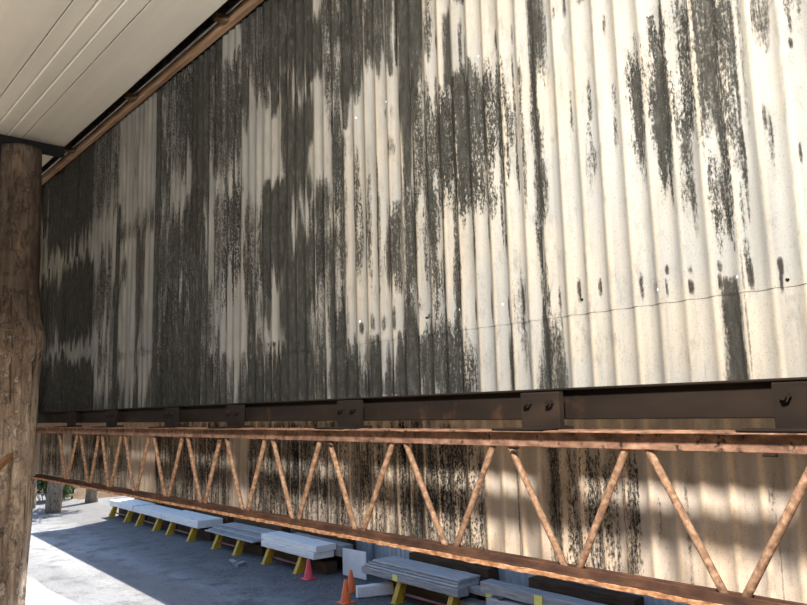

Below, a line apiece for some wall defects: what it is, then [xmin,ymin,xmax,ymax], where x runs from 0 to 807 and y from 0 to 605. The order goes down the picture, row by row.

leakage [750,0,769,52]
leakage [38,0,568,412]
leakage [625,0,754,380]
leakage [154,437,231,506]
leakage [247,439,488,549]
leakage [545,447,642,576]